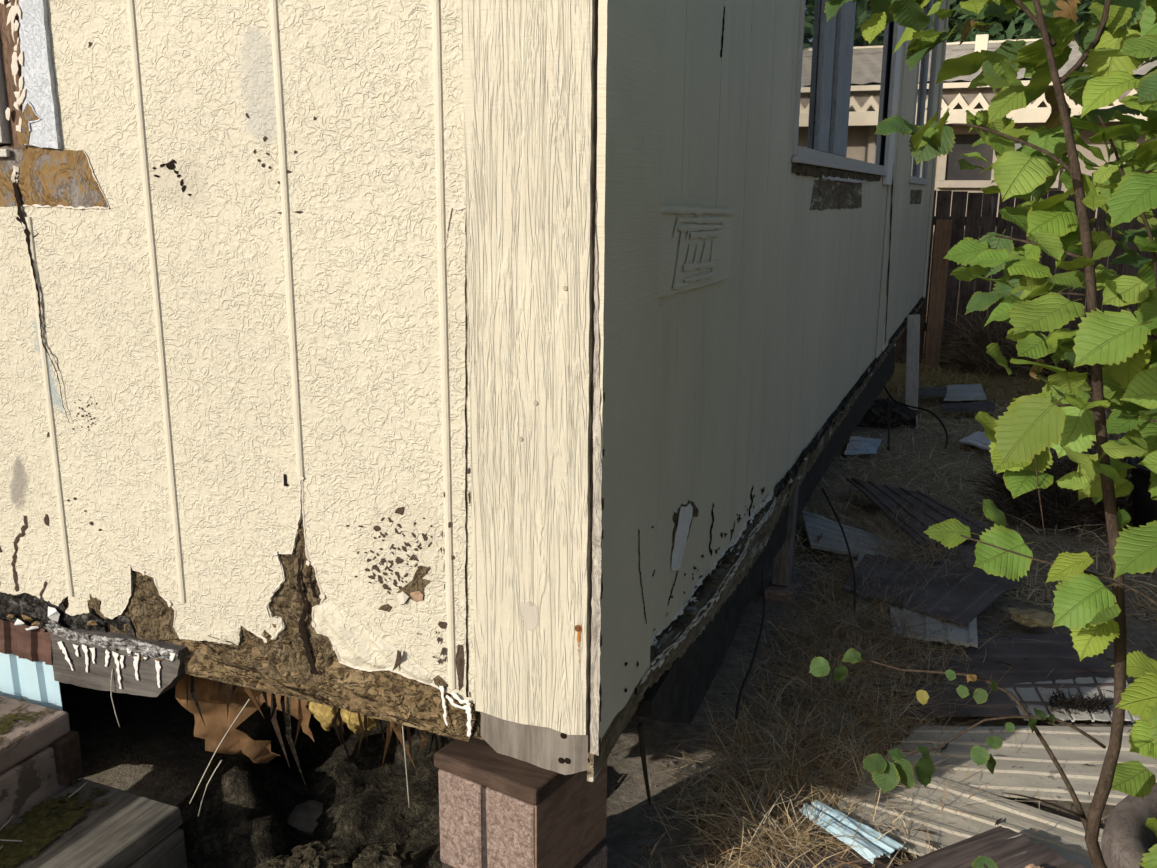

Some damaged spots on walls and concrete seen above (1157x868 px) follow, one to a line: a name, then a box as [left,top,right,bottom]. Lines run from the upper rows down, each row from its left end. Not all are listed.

peeling [0,0,110,209]
peeling [153,159,191,196]
crack [11,165,69,422]
peeling [87,593,100,613]
spalling [115,563,179,641]
spalling [229,474,776,782]